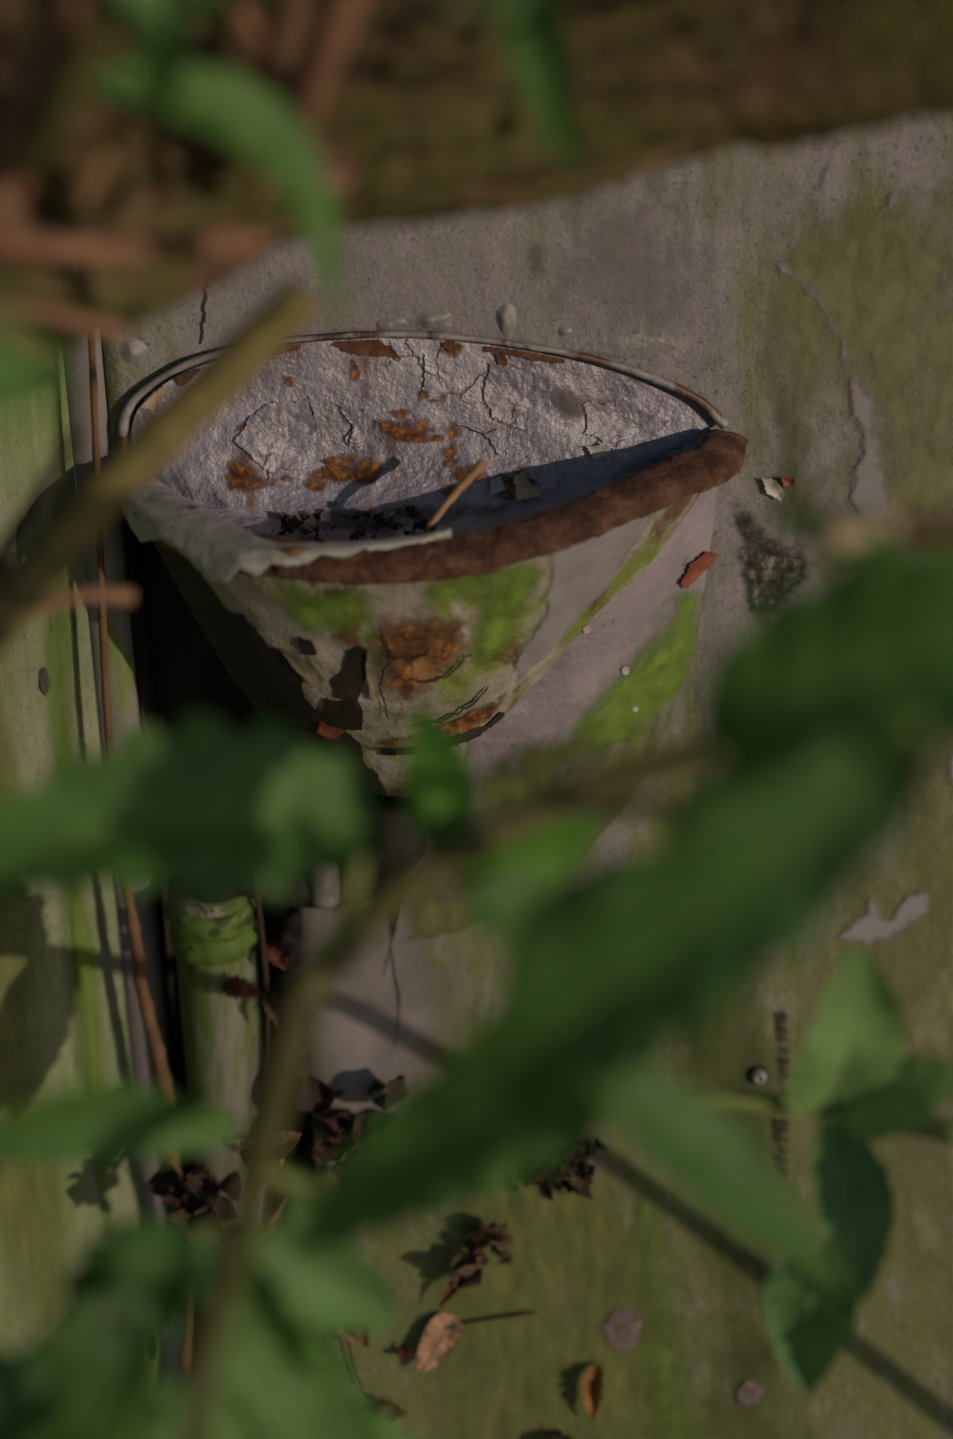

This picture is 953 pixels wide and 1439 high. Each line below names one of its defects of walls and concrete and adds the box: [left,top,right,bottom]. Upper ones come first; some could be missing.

rust [350,360,367,389]
rust [227,391,536,507]